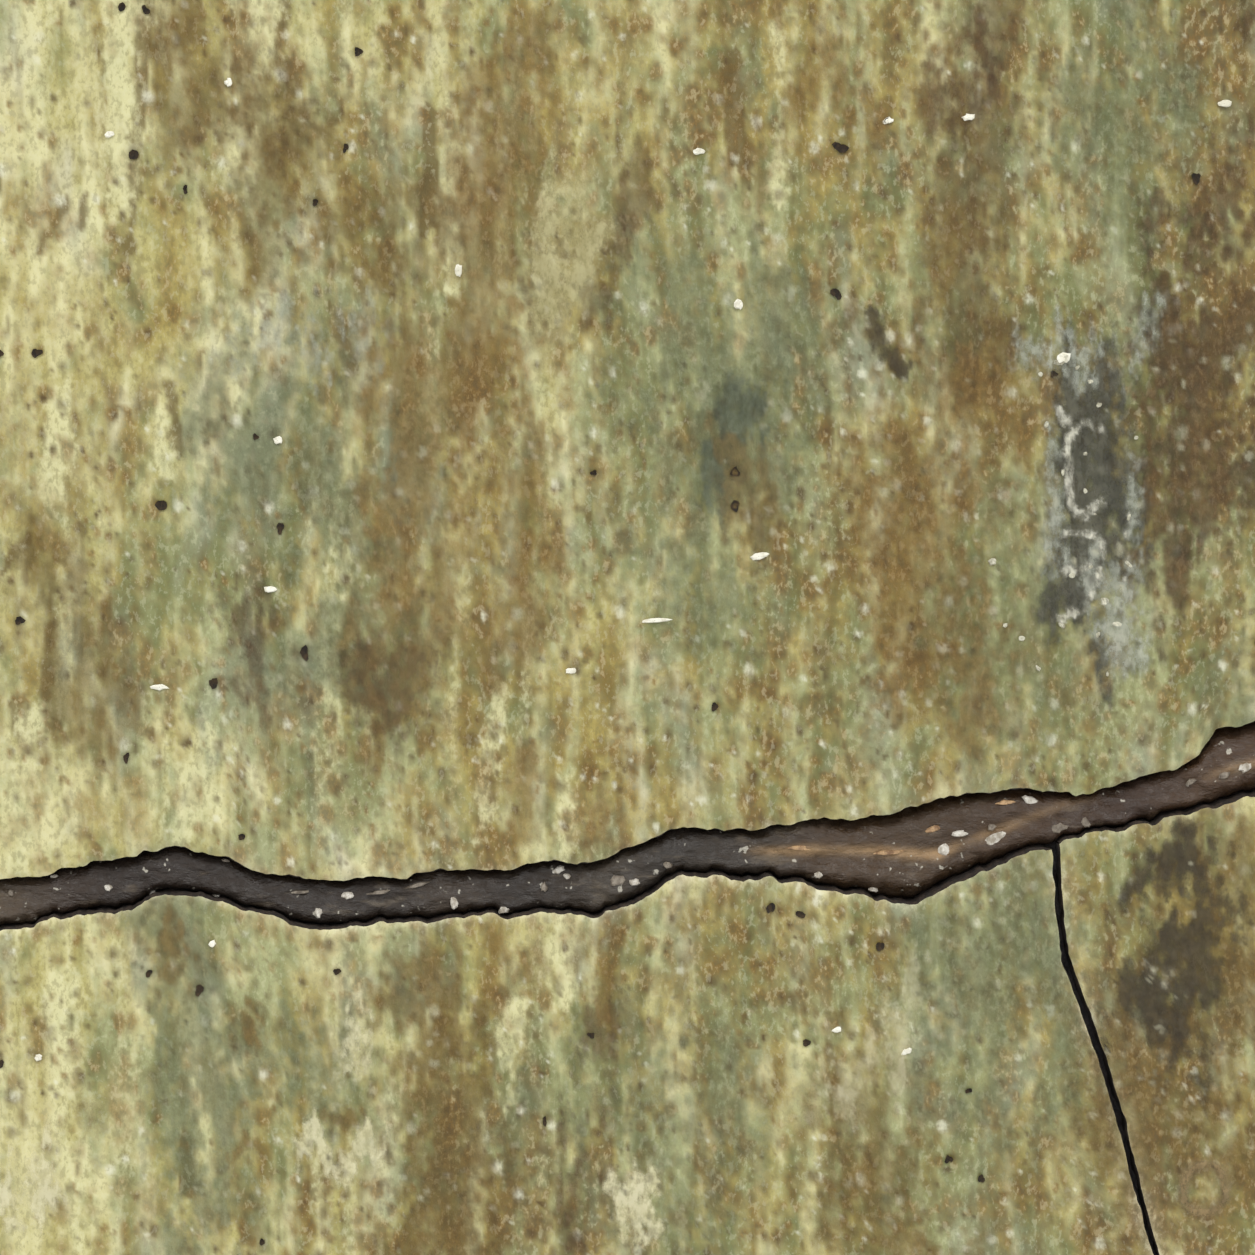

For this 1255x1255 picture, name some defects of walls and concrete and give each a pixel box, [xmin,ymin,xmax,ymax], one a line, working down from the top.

crack [0,721,1255,1255]